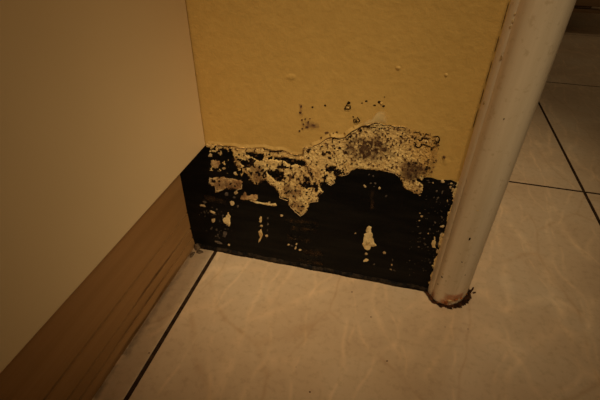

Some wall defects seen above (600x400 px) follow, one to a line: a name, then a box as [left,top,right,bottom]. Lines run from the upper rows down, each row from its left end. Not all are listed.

peeling [199,123,459,284]
corrosion [424,287,476,309]